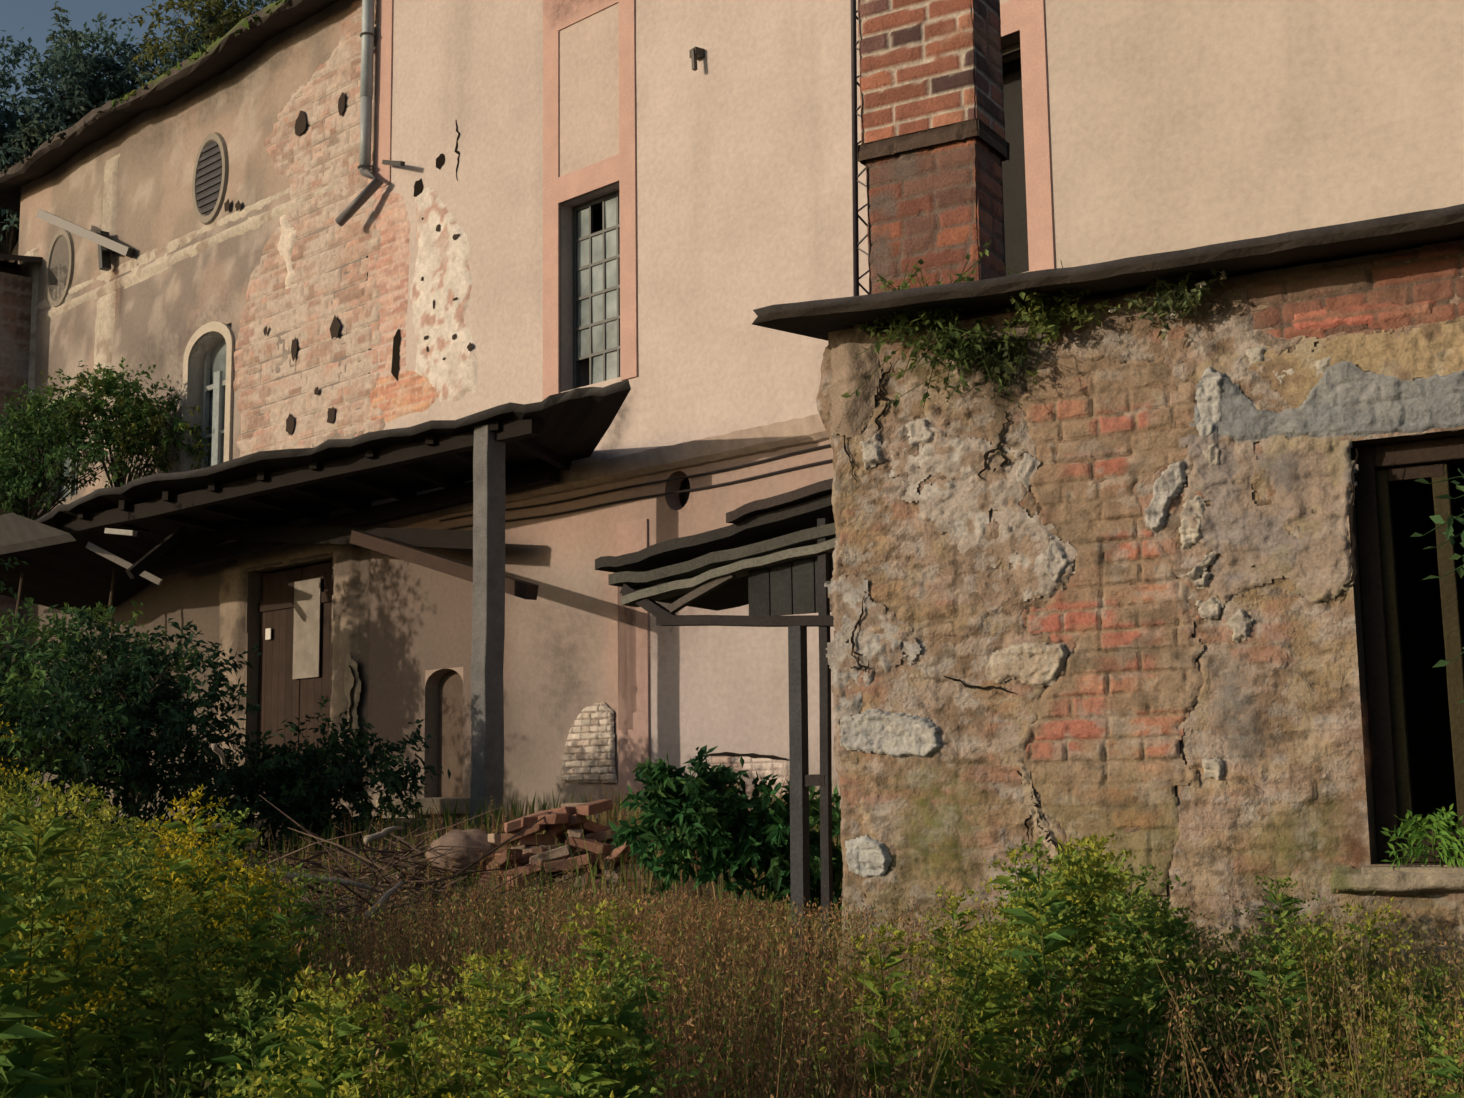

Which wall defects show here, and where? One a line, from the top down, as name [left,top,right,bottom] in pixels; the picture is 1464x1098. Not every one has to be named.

crack [453,120,461,180]
spalling [233,0,478,457]
spalling [1246,239,1464,409]
crack [844,362,892,483]
crack [977,412,1011,479]
crack [850,597,869,673]
peeling [824,574,942,758]
crack [943,675,1014,694]
spalling [859,351,1359,907]
spalling [561,702,617,784]
crack [1017,764,1063,865]